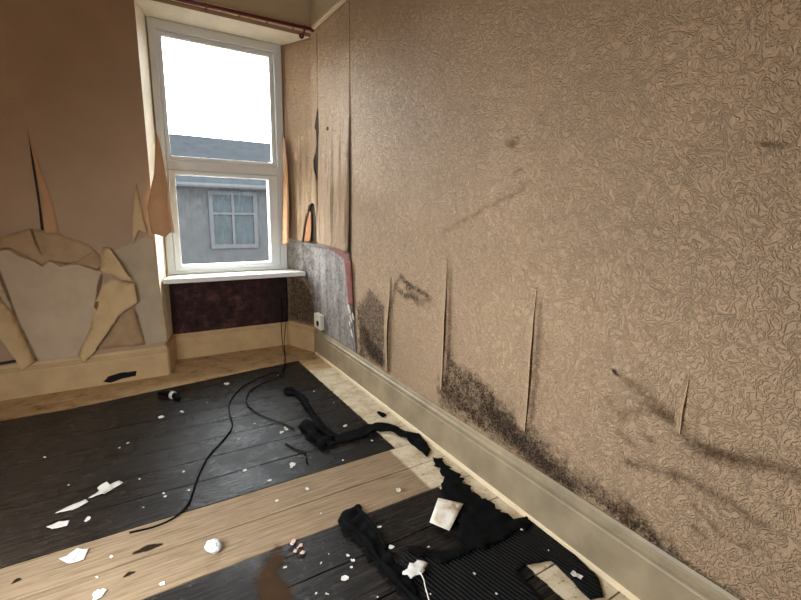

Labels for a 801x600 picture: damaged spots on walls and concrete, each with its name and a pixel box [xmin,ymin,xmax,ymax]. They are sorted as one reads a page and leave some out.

flaking render [0,249,104,361]
flaking render [115,185,167,345]
flaking render [288,240,356,352]
damp [358,289,385,366]
damp [438,344,728,592]